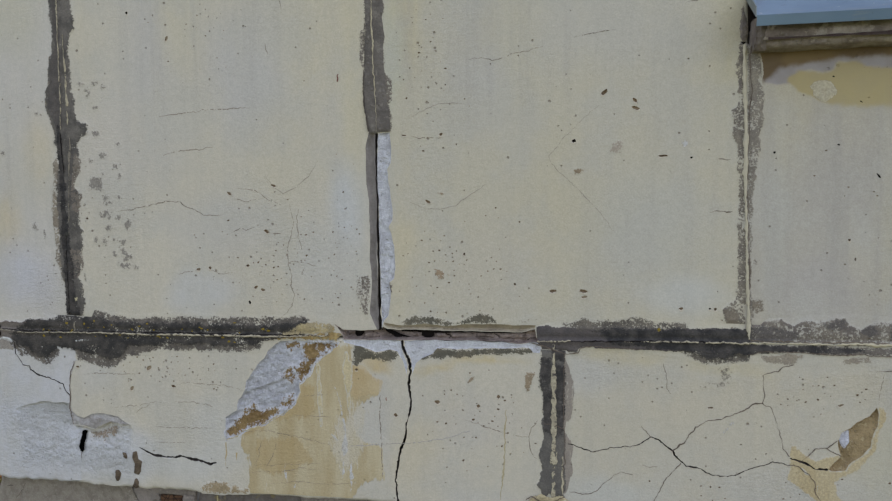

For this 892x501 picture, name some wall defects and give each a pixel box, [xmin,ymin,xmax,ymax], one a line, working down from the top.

leakage [760,47,892,121]
leakage [87,141,140,271]
crack [227,188,313,315]
peeling [224,0,581,501]
crack [10,338,74,424]
spalling [9,401,143,482]
crack [138,447,217,466]
leakage [0,308,400,498]
crack [263,134,540,501]
leakage [401,312,752,393]
crack [470,351,892,501]
spalling [790,408,879,500]